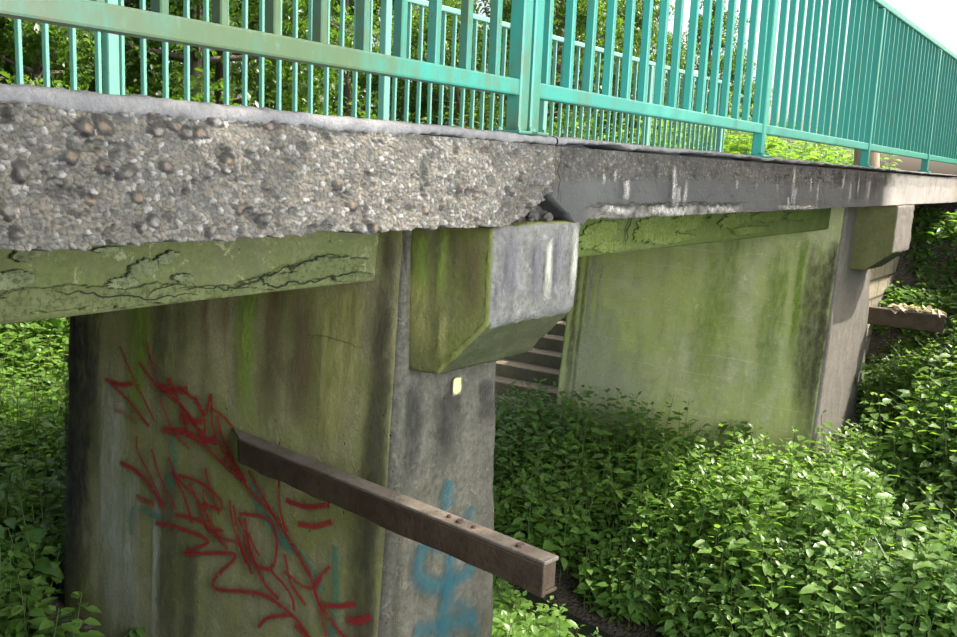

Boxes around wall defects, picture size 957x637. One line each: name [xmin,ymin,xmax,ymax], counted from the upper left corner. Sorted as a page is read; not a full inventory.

crack [58,254,362,301]
damp [367,238,424,486]
damp [792,251,835,400]
damp [64,315,95,566]
damp [353,522,375,637]